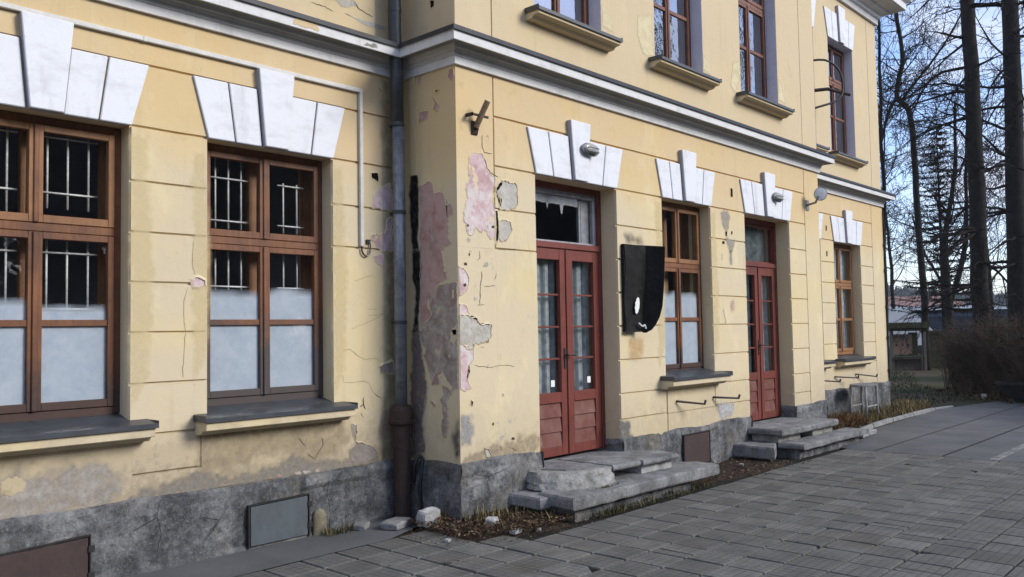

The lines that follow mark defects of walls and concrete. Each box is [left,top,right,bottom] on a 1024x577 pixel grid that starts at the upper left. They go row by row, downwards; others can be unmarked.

peeling [370,171,393,267]
flaking render [419,152,518,438]
crack [343,309,383,418]
leakage [0,464,121,519]
spalling [349,423,378,466]